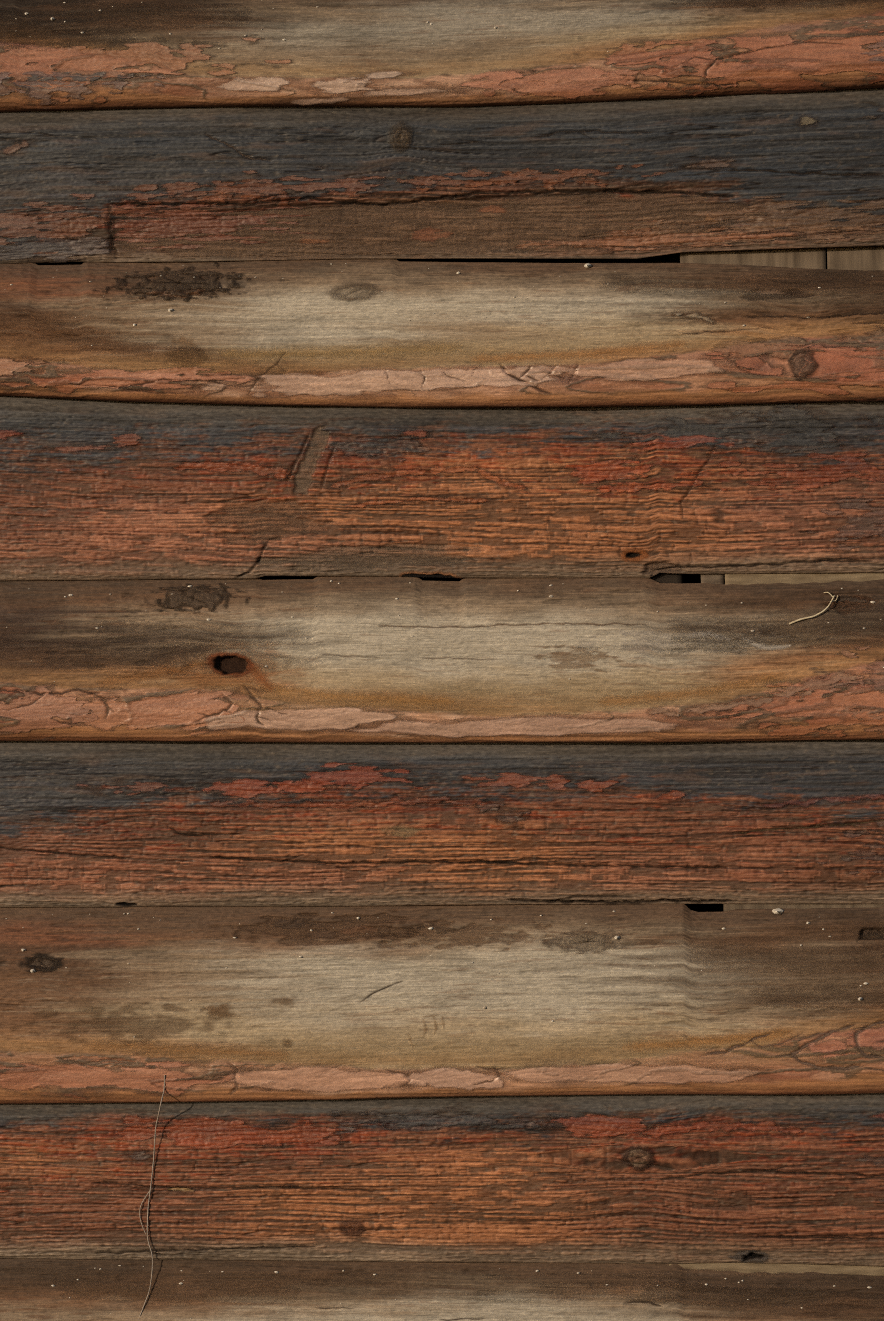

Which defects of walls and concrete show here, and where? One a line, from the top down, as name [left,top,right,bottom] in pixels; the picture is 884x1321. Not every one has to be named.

peeling [44,433,142,452]
peeling [173,460,291,480]
peeling [327,429,526,490]
peeling [561,435,884,550]
spalling [643,562,682,576]
peeling [115,1107,802,1160]